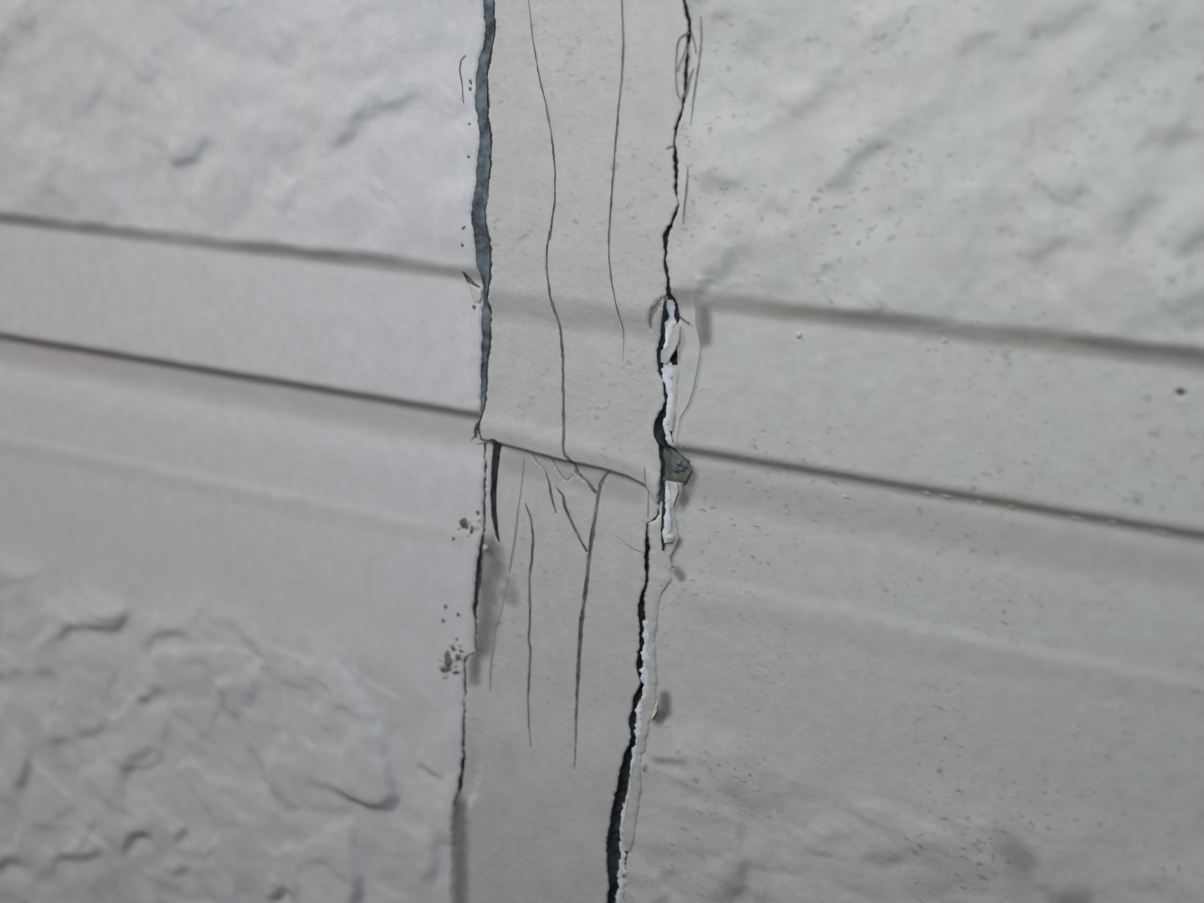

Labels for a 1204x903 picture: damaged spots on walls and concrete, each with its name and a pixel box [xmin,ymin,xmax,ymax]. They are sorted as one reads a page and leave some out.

crack [453,0,697,903]
peeling [655,292,701,544]